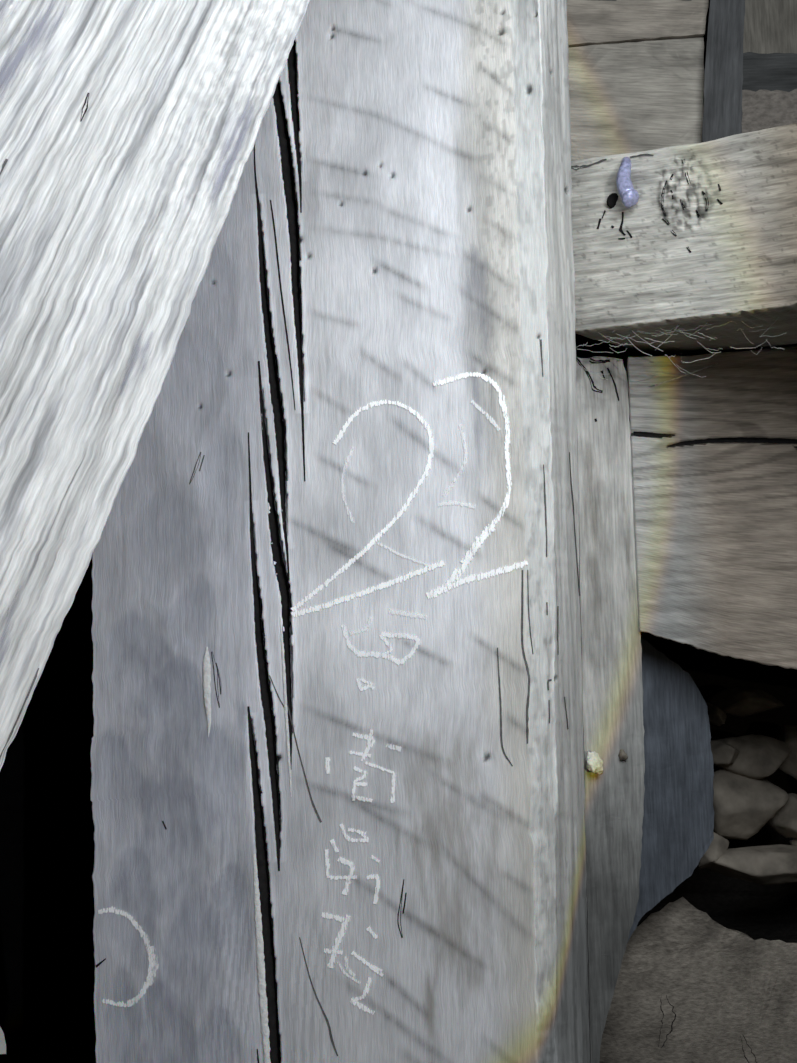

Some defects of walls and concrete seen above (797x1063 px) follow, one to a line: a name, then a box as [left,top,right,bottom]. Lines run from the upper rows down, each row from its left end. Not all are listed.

crack [633,431,797,448]
crack [247,40,322,1063]
crack [299,937,338,1056]